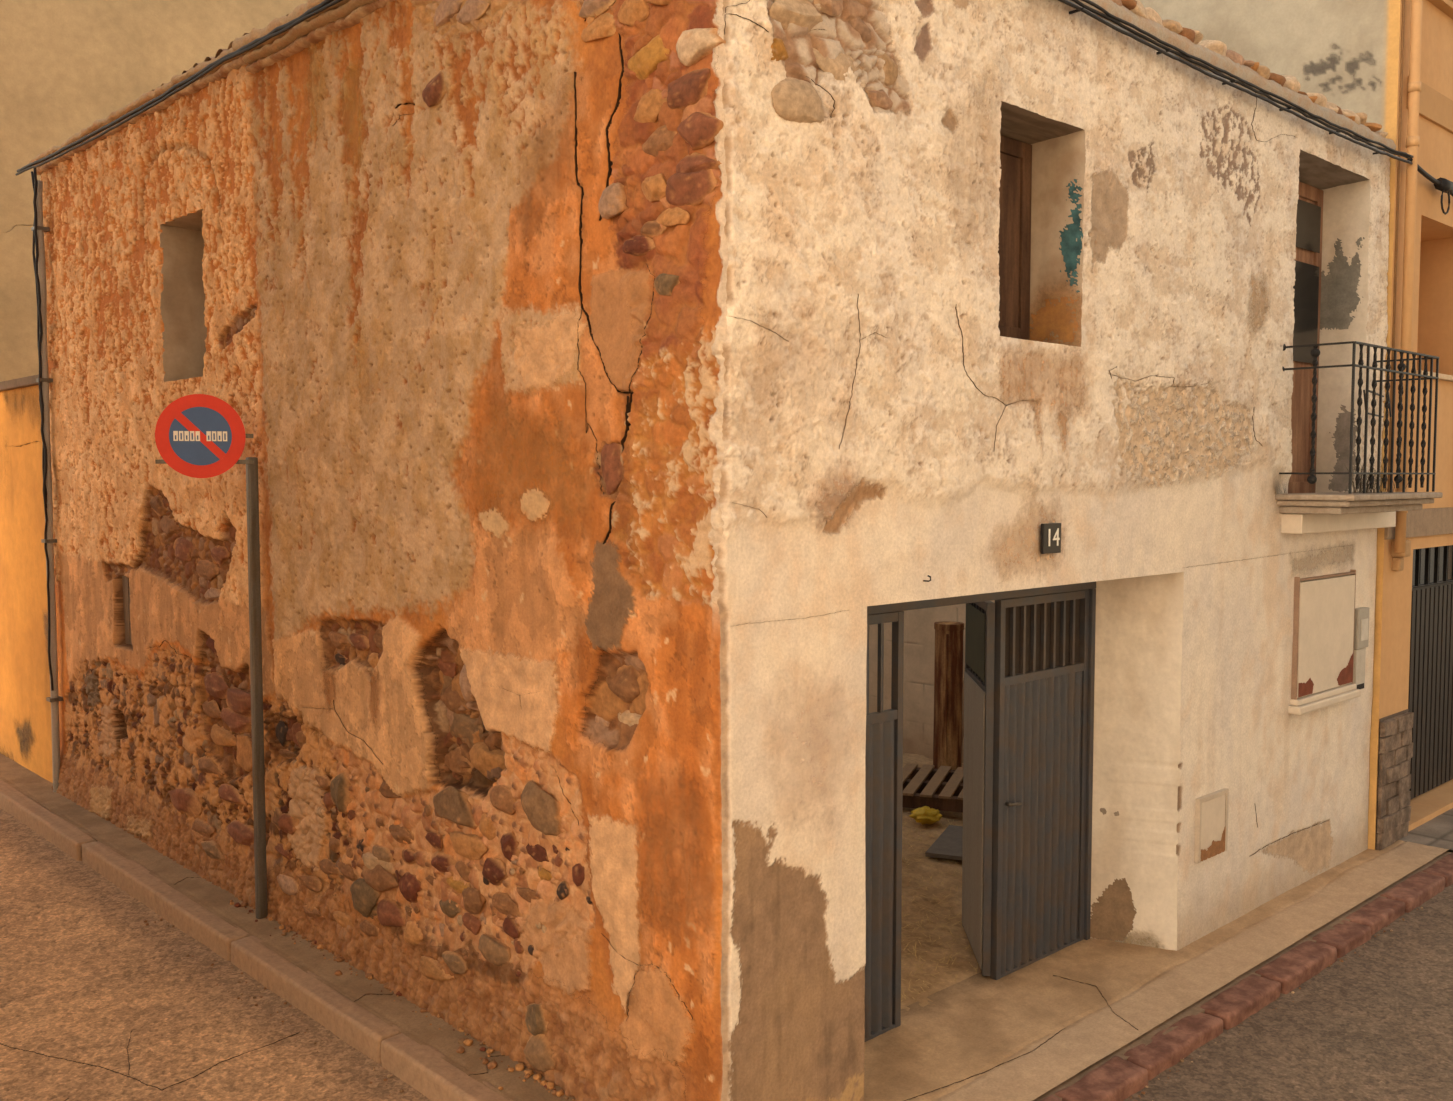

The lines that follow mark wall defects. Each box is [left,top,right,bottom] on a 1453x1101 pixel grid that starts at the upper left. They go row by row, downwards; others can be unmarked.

flaking render [767,0,911,124]
peeling [914,0,935,62]
crack [574,18,655,544]
flaking render [513,0,726,393]
peeling [1059,142,1155,293]
peeling [1197,105,1260,226]
crack [955,304,1027,448]
spalling [105,485,237,603]
spalling [320,617,385,675]
flaking render [267,630,694,1101]
peeling [728,820,865,1101]
peeling [1090,878,1137,941]